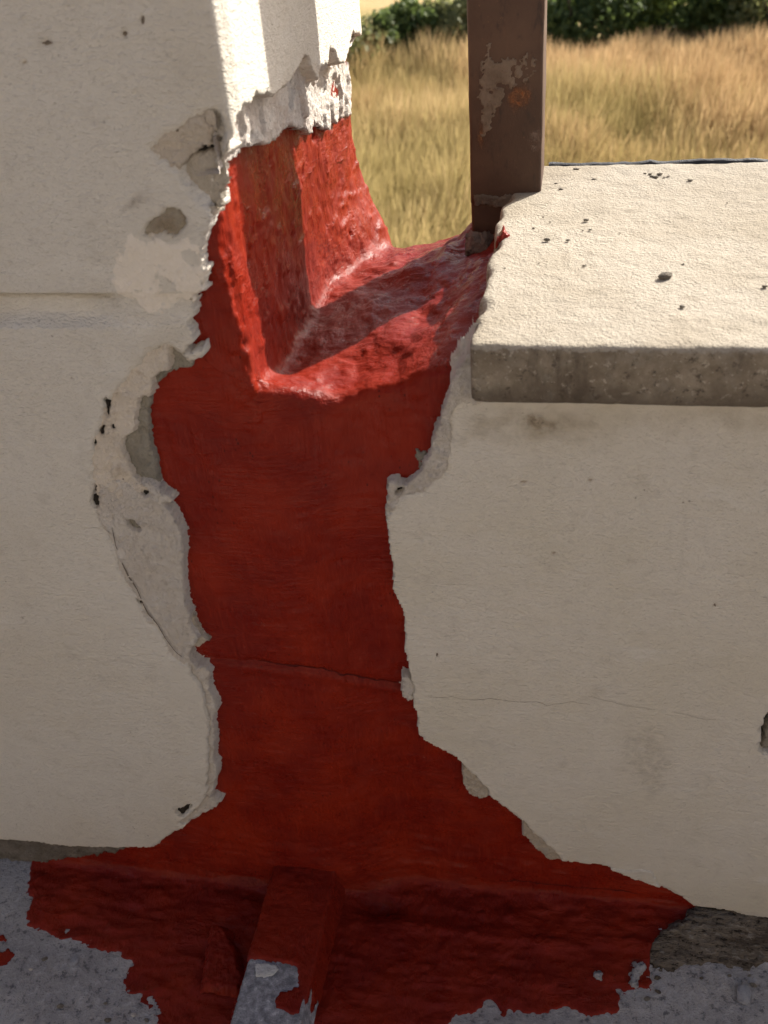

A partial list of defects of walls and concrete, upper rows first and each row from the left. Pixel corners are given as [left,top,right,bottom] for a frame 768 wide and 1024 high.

peeling [477,42,537,139]
peeling [150,61,352,215]
spalling [145,207,186,238]
peeling [495,225,510,249]
spalling [385,319,482,519]
spalling [91,344,226,823]
crack [259,660,399,683]
flaking render [399,666,414,701]
spalling [462,763,489,799]
spalling [522,821,561,860]
peeling [628,961,647,989]